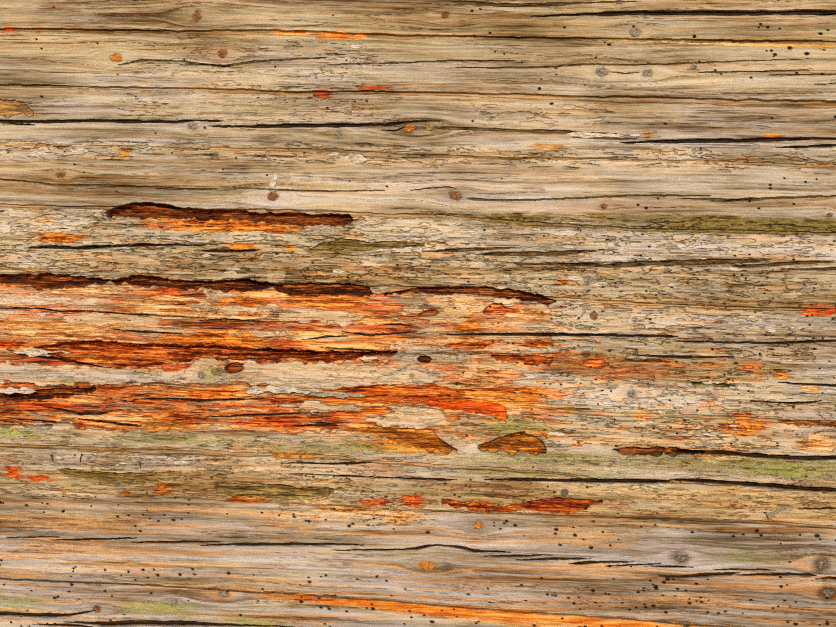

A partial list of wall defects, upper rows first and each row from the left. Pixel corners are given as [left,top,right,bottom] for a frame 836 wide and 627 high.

crack [0,120,836,148]
spalling [0,203,492,270]
spalling [0,258,556,329]
spalling [0,338,574,456]
spalling [779,420,836,428]
spalling [614,432,728,457]
crack [671,449,836,460]
spalling [46,456,217,483]
spalling [217,482,334,499]
spalling [442,497,602,513]
crack [7,536,836,579]
crack [0,610,292,627]